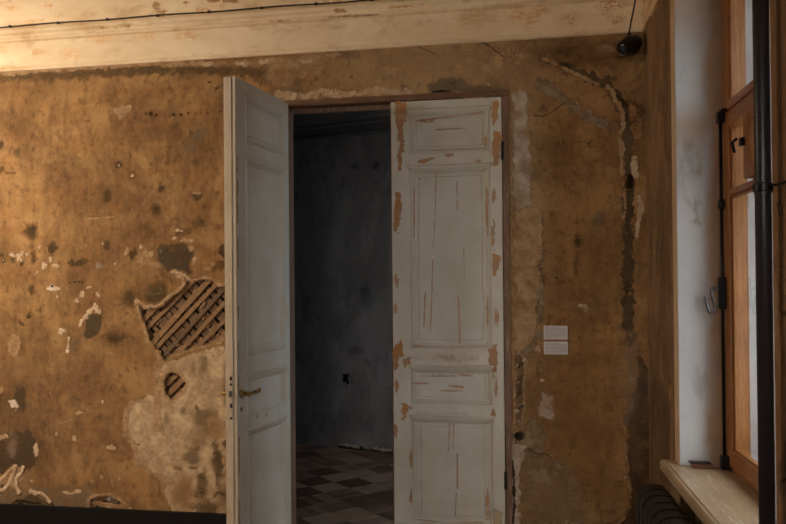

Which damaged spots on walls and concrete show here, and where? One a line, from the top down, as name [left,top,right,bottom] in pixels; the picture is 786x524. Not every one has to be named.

peeling [395,101,407,171]
flaking render [417,90,545,352]
damp [125,234,225,276]
damp [0,379,26,412]
damp [0,428,39,474]
flaking render [107,345,226,513]
damp [0,486,90,507]